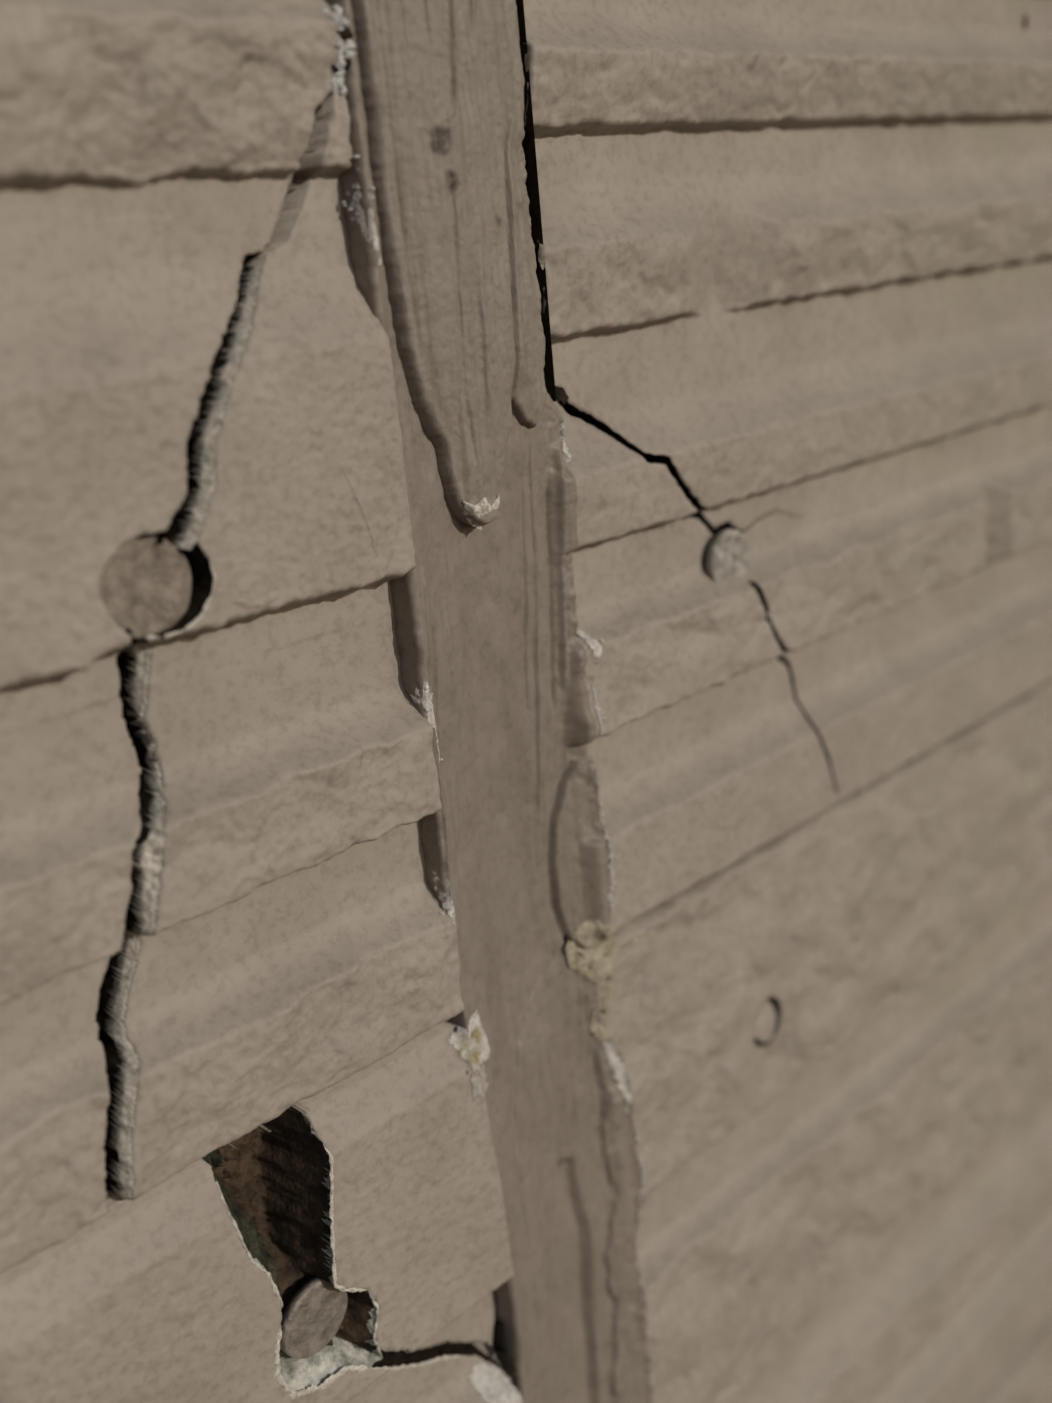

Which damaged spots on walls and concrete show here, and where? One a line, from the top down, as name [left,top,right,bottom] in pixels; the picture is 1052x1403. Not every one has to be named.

crack [154,4,357,550]
crack [555,386,804,536]
crack [748,581,838,793]
crack [95,628,167,1208]
spalling [202,1106,383,1399]